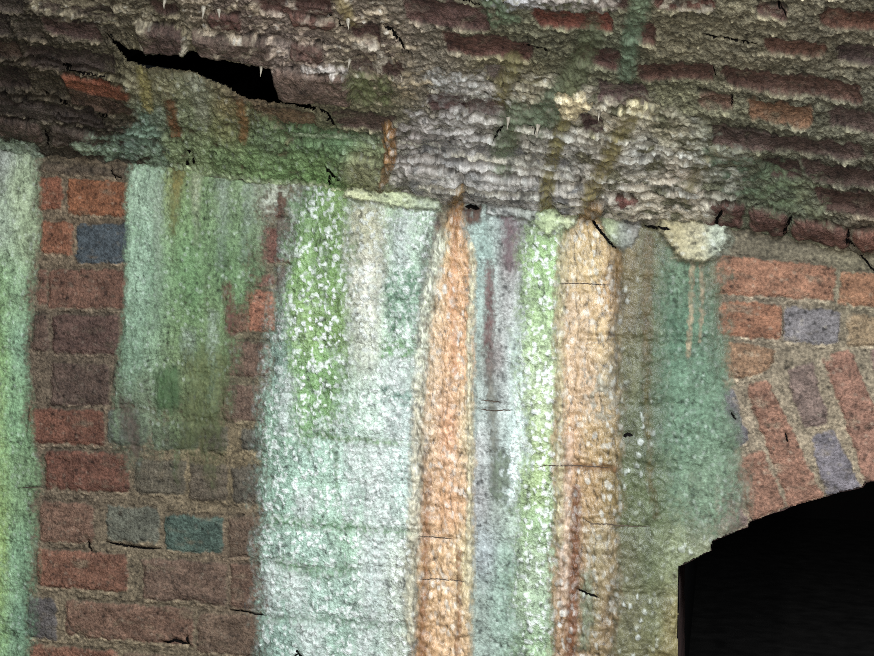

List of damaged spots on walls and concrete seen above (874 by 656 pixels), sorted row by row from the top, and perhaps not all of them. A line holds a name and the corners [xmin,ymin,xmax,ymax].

peeling [426,71,509,104]
peeling [555,92,592,121]
peeling [618,100,658,117]
damp [291,133,380,145]
peeling [454,152,574,176]
peeling [516,125,572,144]
peeling [596,137,708,165]
peeling [419,185,539,210]
crack [591,220,616,249]
crack [783,215,792,235]
damp [686,261,704,357]
damp [110,163,436,656]